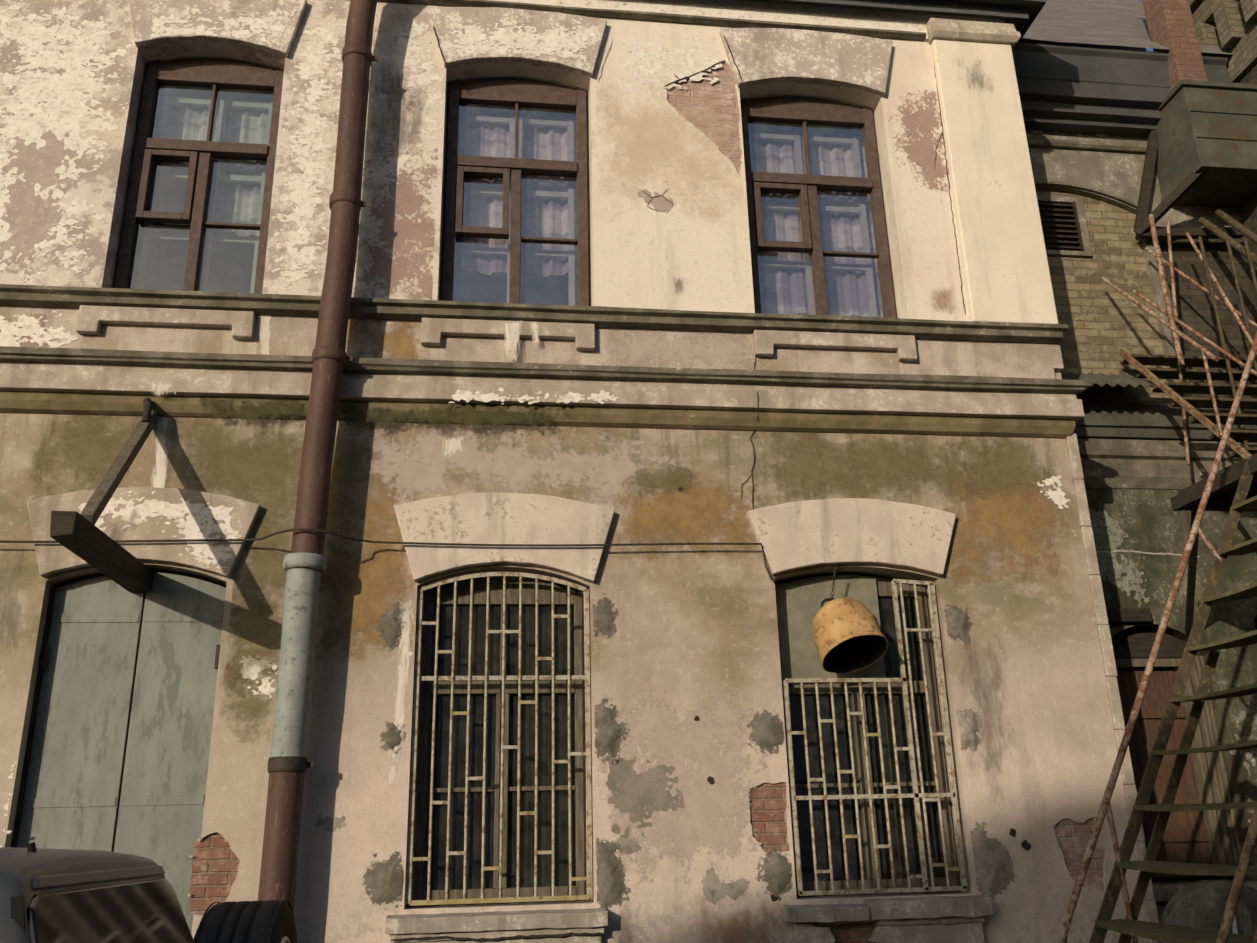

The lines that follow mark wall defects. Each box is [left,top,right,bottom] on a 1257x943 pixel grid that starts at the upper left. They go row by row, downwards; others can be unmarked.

peeling [0,0,135,285]
peeling [149,7,349,290]
peeling [357,0,927,300]
peeling [890,90,949,192]
crack [932,53,966,315]
peeling [448,387,618,404]
damp [637,468,691,492]
crack [741,357,759,510]
peeling [1037,475,1070,509]
spalling [187,832,240,915]
damp [597,752,686,839]
peeling [597,689,789,905]